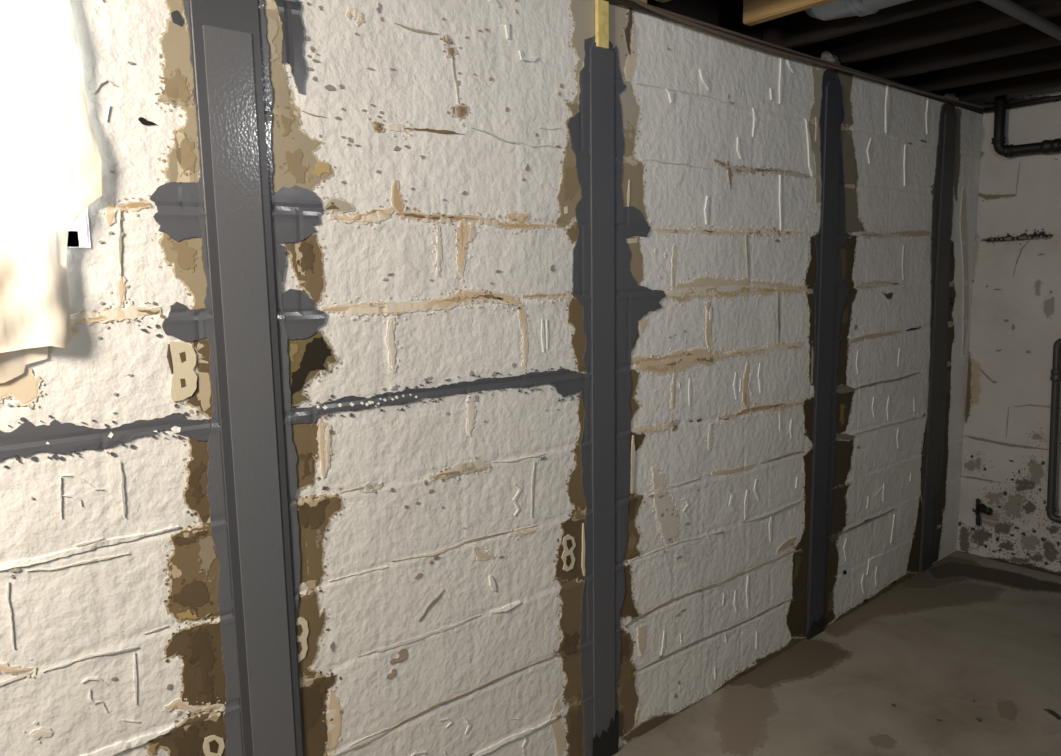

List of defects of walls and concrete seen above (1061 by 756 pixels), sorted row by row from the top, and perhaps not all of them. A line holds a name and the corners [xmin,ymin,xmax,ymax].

peeling [551,0,595,244]
peeling [609,1,648,221]
peeling [179,338,213,419]
peeling [566,292,586,373]
peeling [626,236,645,285]
peeling [807,66,865,628]
peeling [144,436,227,756]
peeling [291,415,344,756]
water stain [712,428,1061,756]